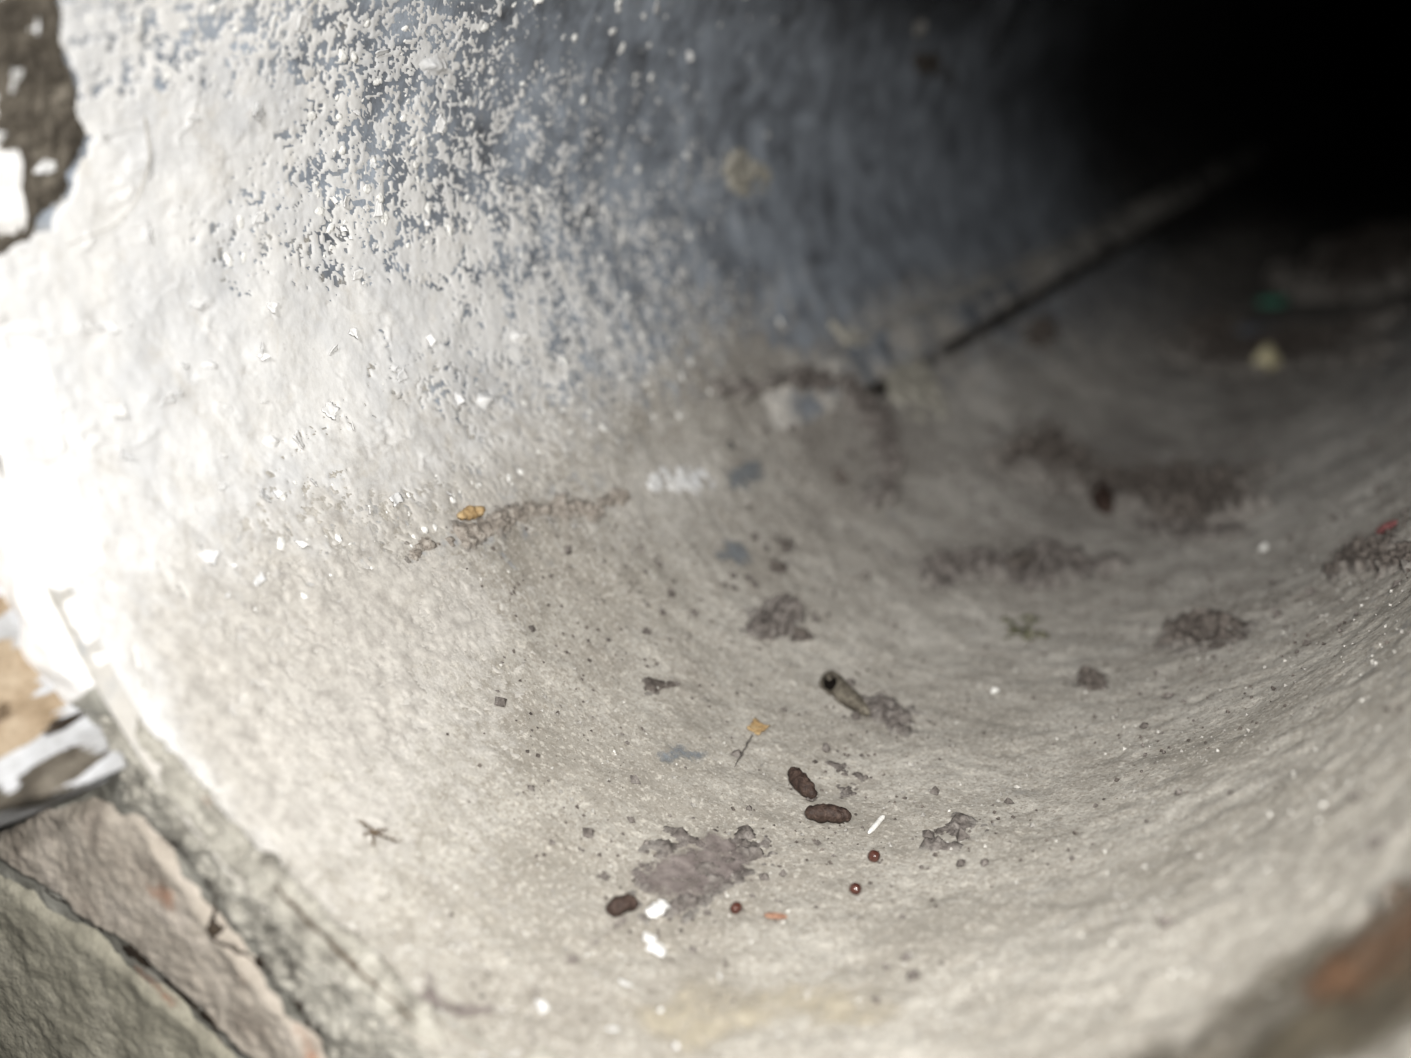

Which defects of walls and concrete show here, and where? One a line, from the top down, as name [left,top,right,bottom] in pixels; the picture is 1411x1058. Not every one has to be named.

peeling [0,0,908,937]
peeling [642,899,670,957]